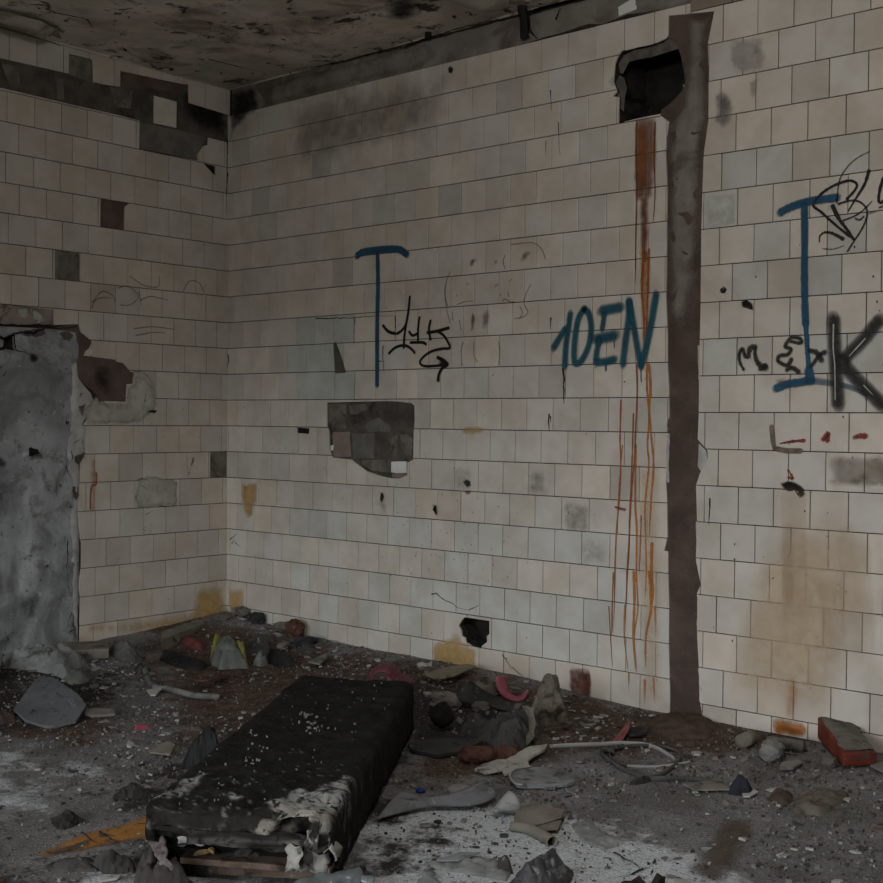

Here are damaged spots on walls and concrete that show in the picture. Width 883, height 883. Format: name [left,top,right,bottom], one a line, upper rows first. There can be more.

peeling [0,0,712,175]
peeling [55,250,80,282]
peeling [100,199,129,234]
rust [635,120,656,336]
spalling [0,304,133,411]
spalling [22,447,40,458]
peeling [328,401,415,479]
water stain [243,485,256,516]
rust [608,364,656,682]
spalling [461,615,489,647]